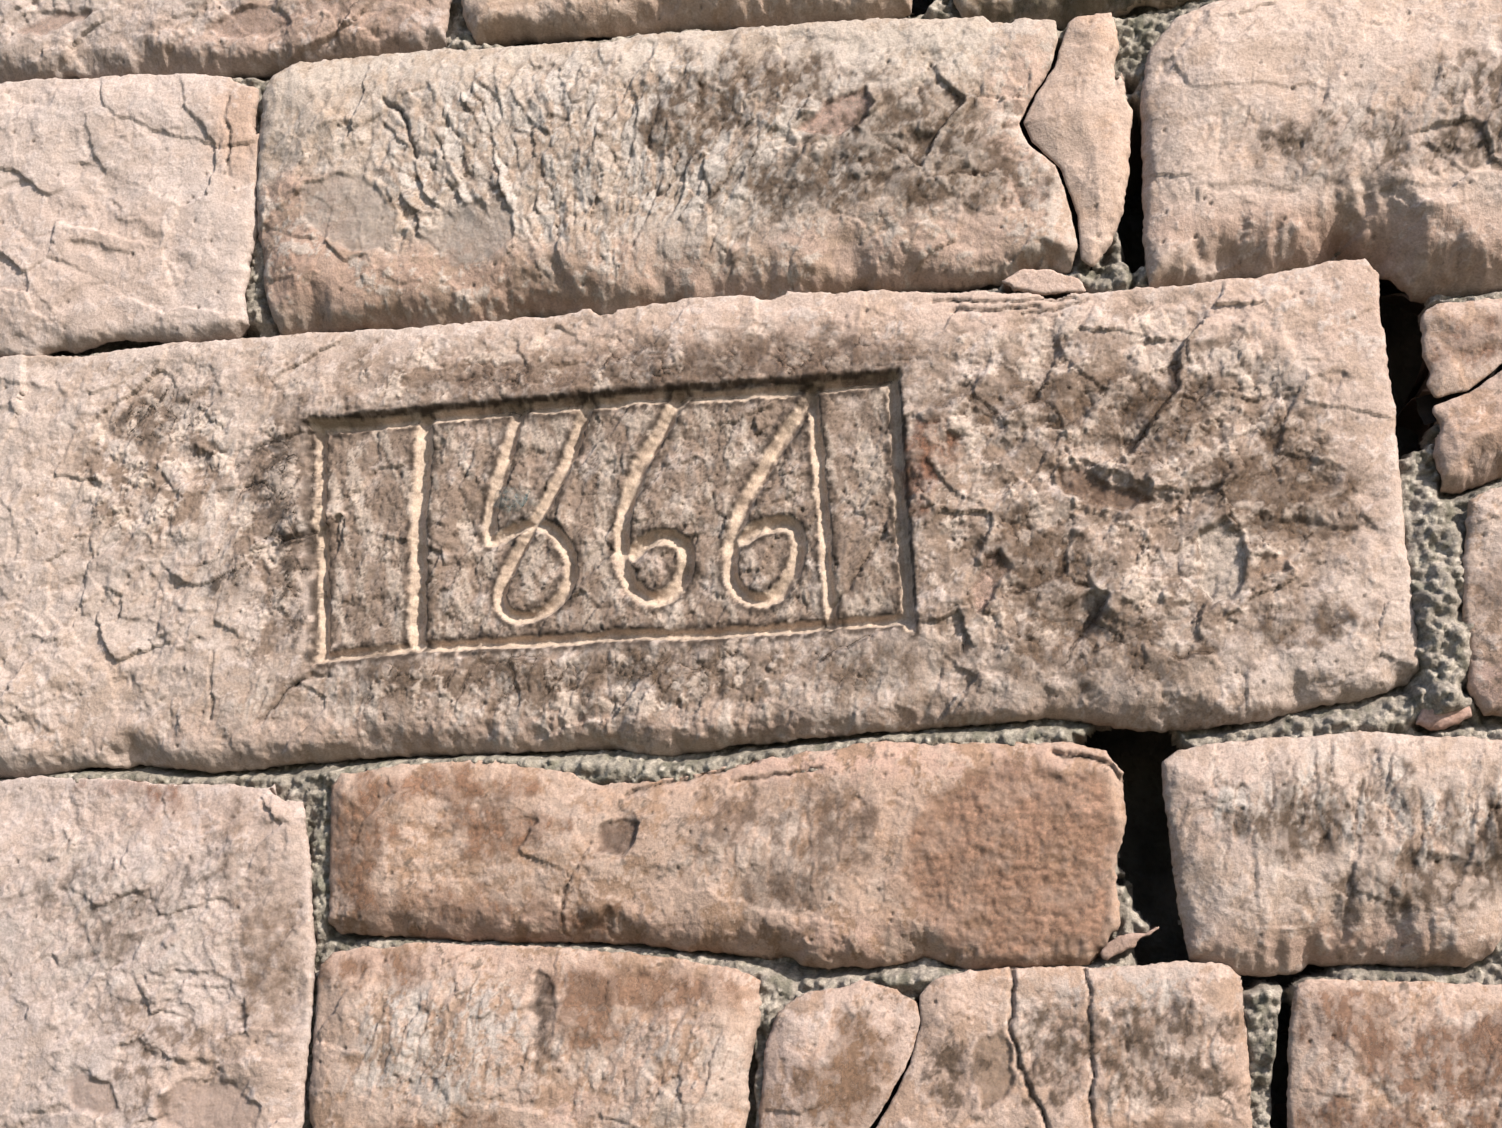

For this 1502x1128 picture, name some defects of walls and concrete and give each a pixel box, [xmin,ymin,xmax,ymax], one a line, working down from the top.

crack [1019,28,1093,271]
crack [1416,364,1502,425]